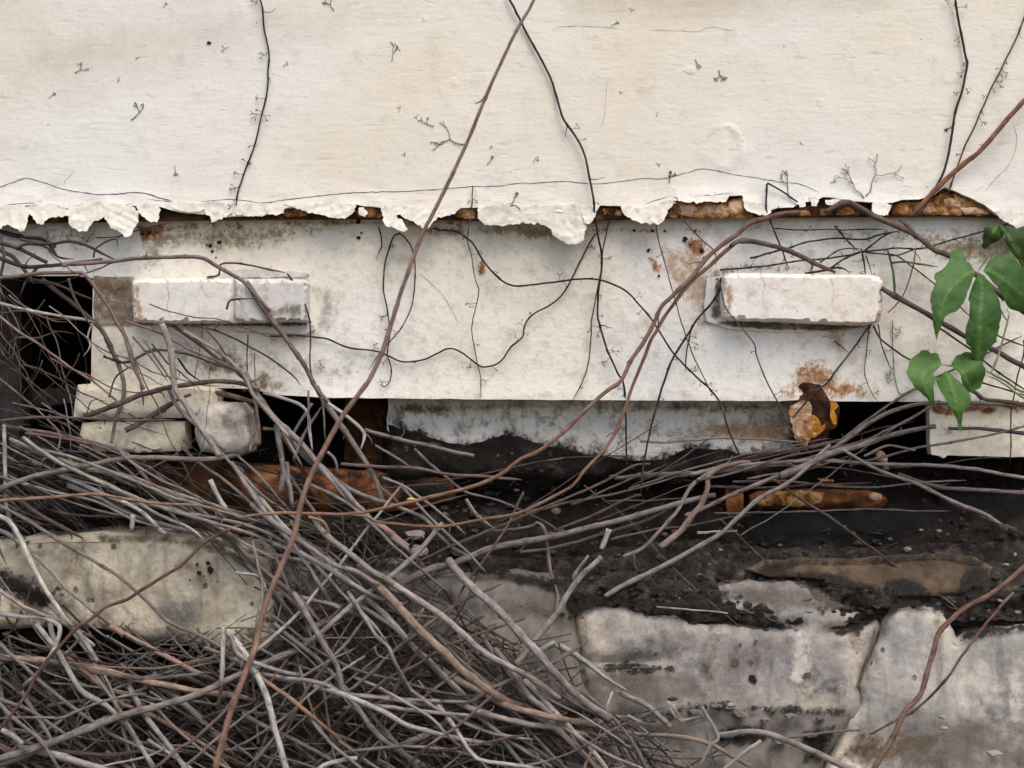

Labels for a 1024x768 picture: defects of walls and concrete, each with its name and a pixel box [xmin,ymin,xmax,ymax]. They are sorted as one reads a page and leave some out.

peeling [0,201,368,237]
peeling [381,205,460,232]
peeling [477,203,596,244]
peeling [621,195,727,225]
peeling [743,199,771,216]
peeling [795,196,841,208]
peeling [871,201,891,216]
peeling [991,209,1024,228]
corrosion [649,197,872,324]
corrosion [699,360,867,452]
corrosion [748,488,888,511]